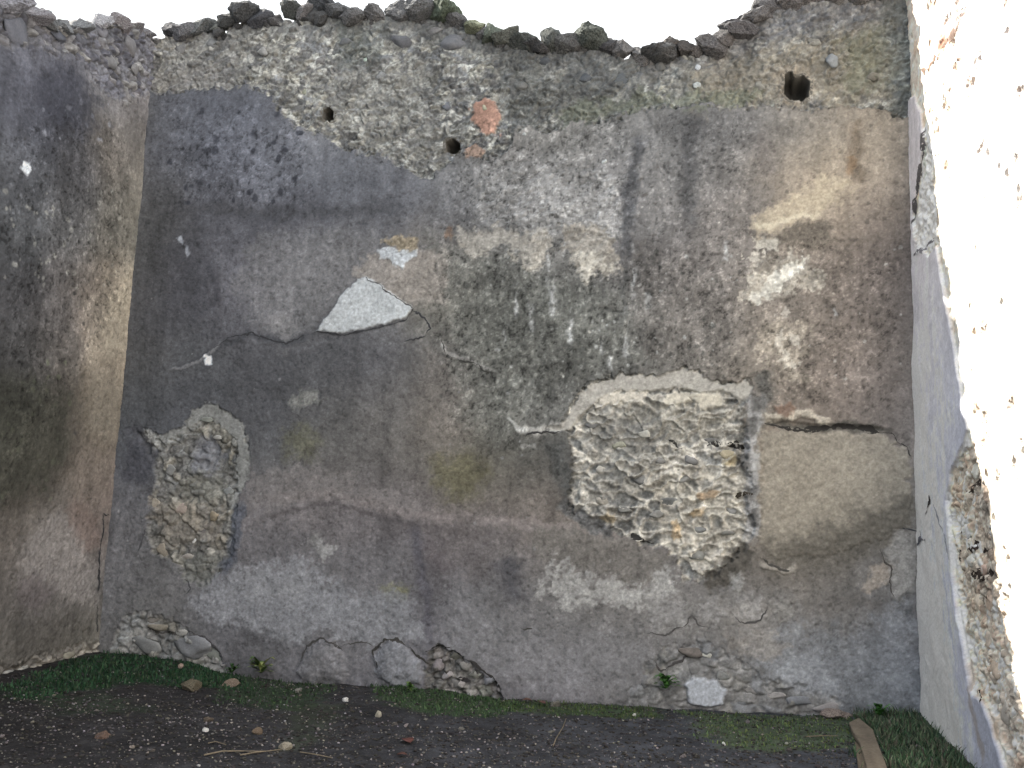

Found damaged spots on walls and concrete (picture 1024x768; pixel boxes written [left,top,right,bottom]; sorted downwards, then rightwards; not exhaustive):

flaking render [0,0,912,180]
crack [172,325,319,372]
spalling [317,309,413,336]
crack [366,277,499,374]
crack [758,400,912,459]
flaking render [123,401,252,588]
flaking render [554,365,845,716]
flaking render [948,400,1024,768]
flaking render [0,609,227,674]
flaking render [422,643,504,700]